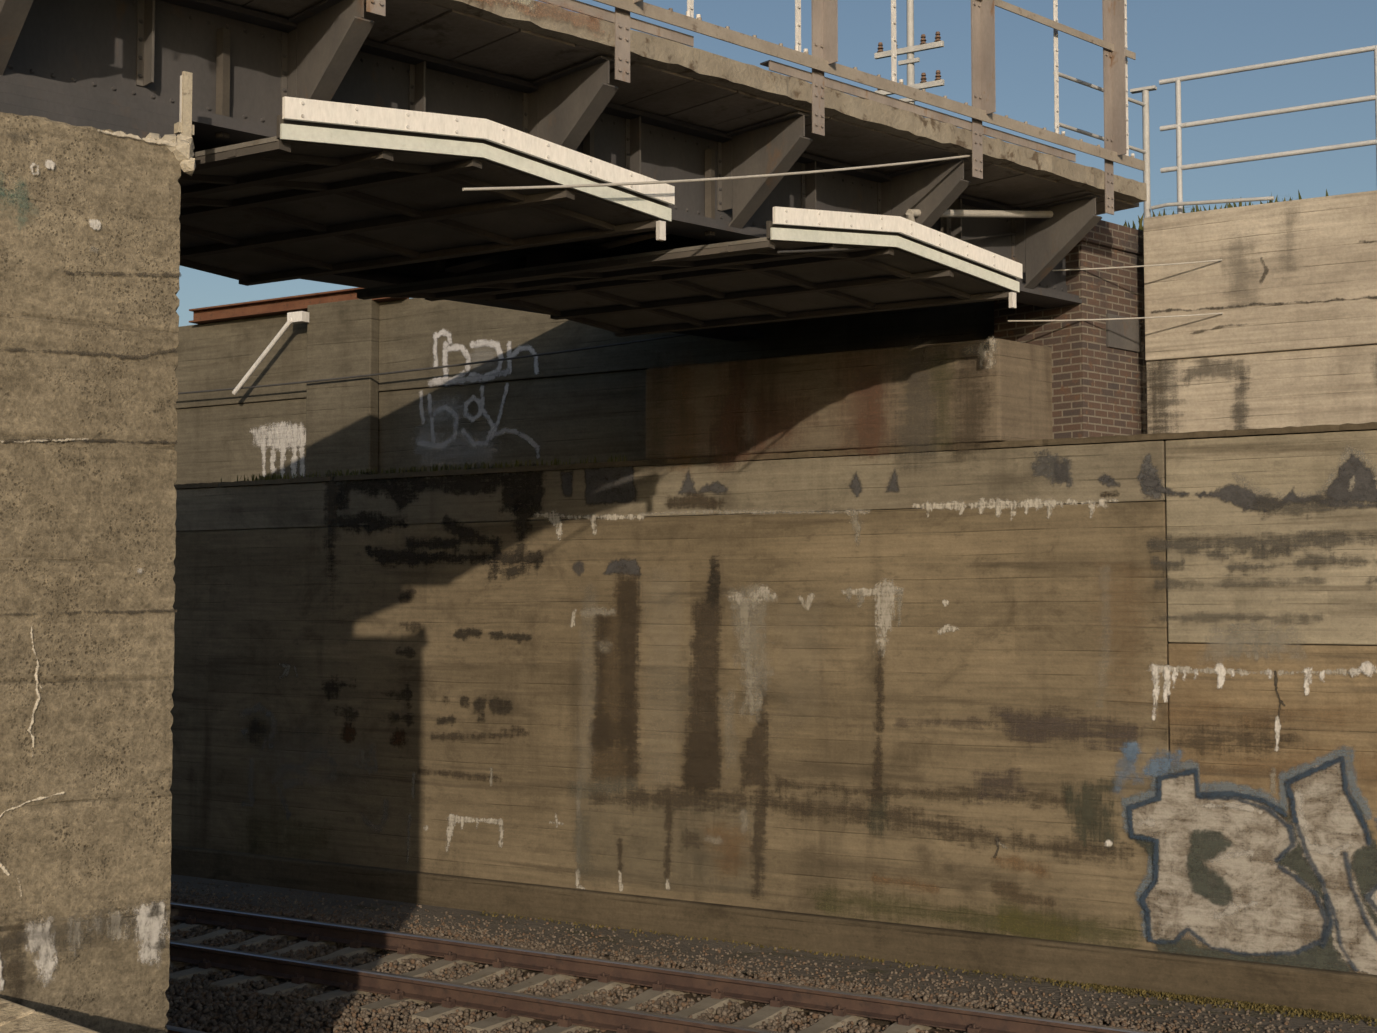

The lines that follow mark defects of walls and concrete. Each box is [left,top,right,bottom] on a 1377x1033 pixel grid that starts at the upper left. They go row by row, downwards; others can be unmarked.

leakage [323,463,644,581]
leakage [913,498,1118,521]
crack [5,609,177,756]
leakage [570,559,1133,894]
leakage [995,662,1377,754]
crack [0,792,65,817]
leakage [0,903,165,1005]